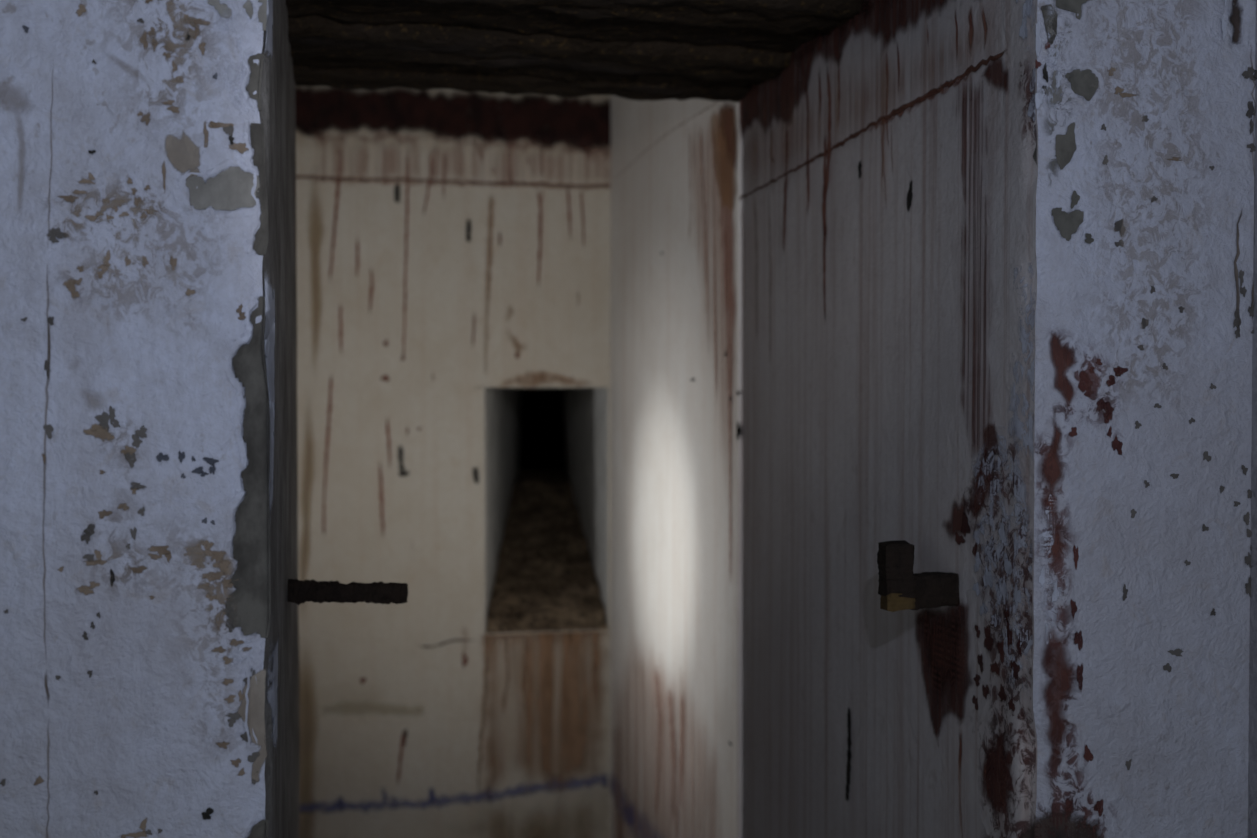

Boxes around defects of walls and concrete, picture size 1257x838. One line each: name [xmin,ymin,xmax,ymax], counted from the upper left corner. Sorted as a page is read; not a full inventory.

peeling [63,250,149,299]
spalling [47,0,273,255]
rust [296,87,610,186]
rust [689,0,987,448]
rust [946,87,998,536]
spalling [1044,191,1094,249]
peeling [1016,0,1137,182]
peeling [1106,368,1128,387]
spalling [77,278,279,785]
rust [1011,266,1123,819]
rust [478,631,601,788]
rust [915,603,971,737]